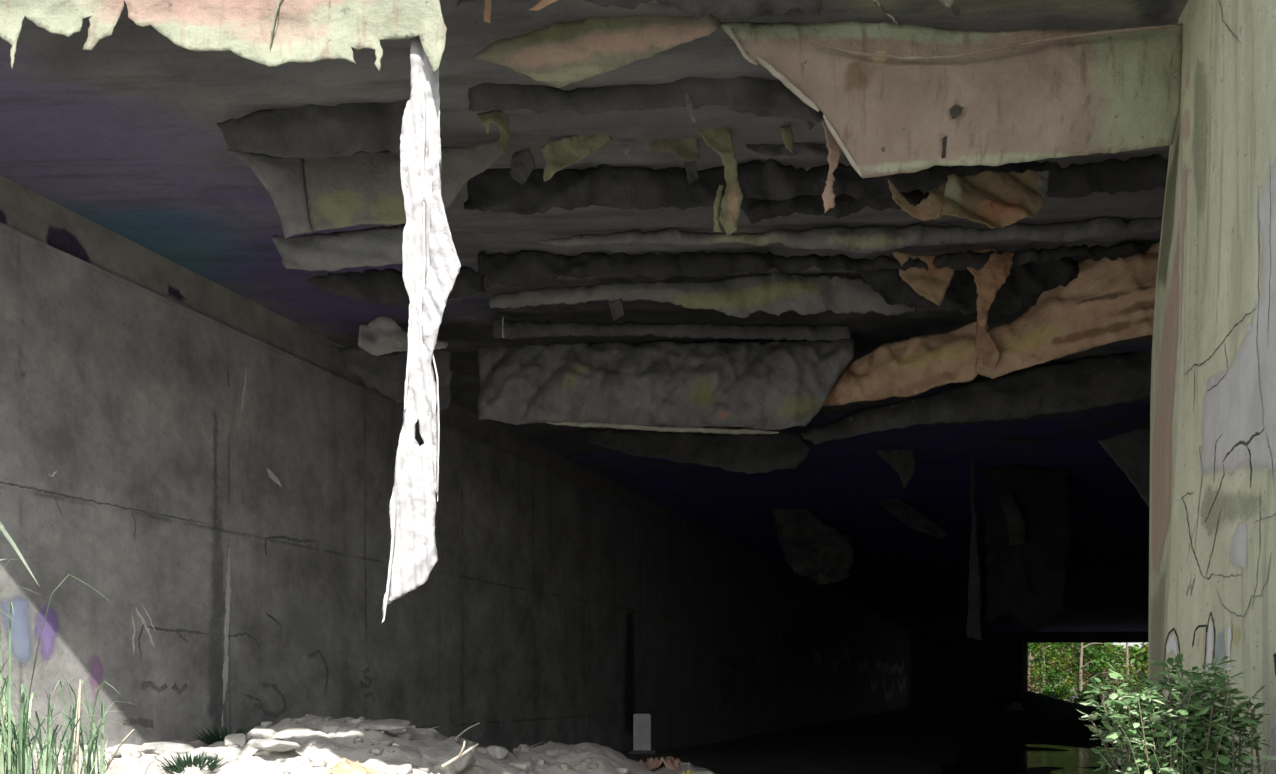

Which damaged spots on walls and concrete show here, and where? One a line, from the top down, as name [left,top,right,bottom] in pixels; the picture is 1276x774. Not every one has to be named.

crack [1180,163,1276,652]
crack [0,481,208,539]
crack [264,535,315,556]